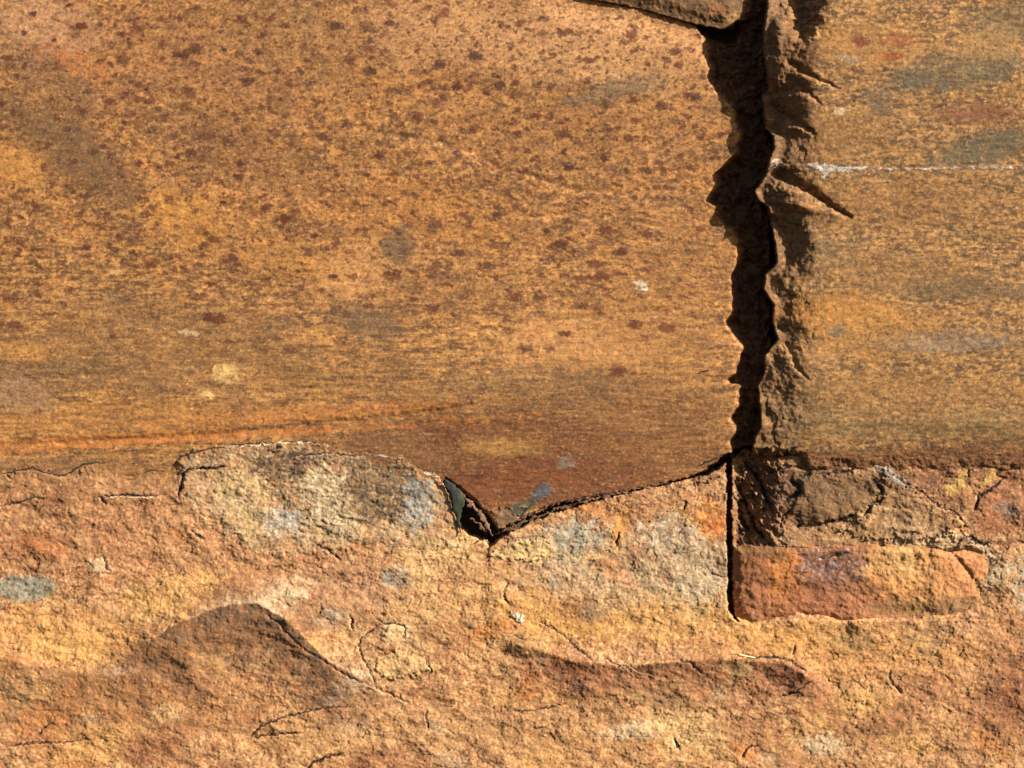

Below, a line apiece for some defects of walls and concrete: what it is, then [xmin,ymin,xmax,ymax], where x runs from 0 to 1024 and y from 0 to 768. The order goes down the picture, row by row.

crack [510,489,623,524]
crack [696,452,1003,546]
spalling [788,466,978,551]